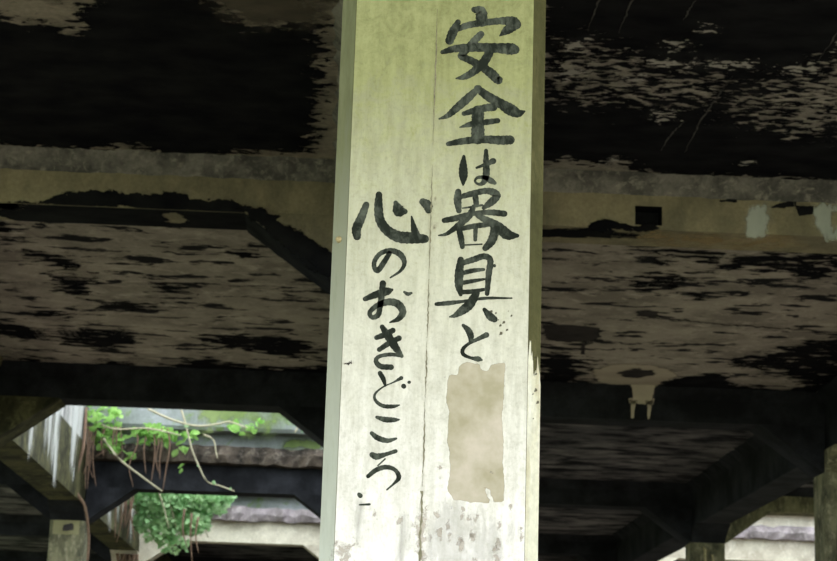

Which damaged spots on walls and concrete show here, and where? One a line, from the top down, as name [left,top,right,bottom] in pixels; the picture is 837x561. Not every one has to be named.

peeling [416,362,512,561]